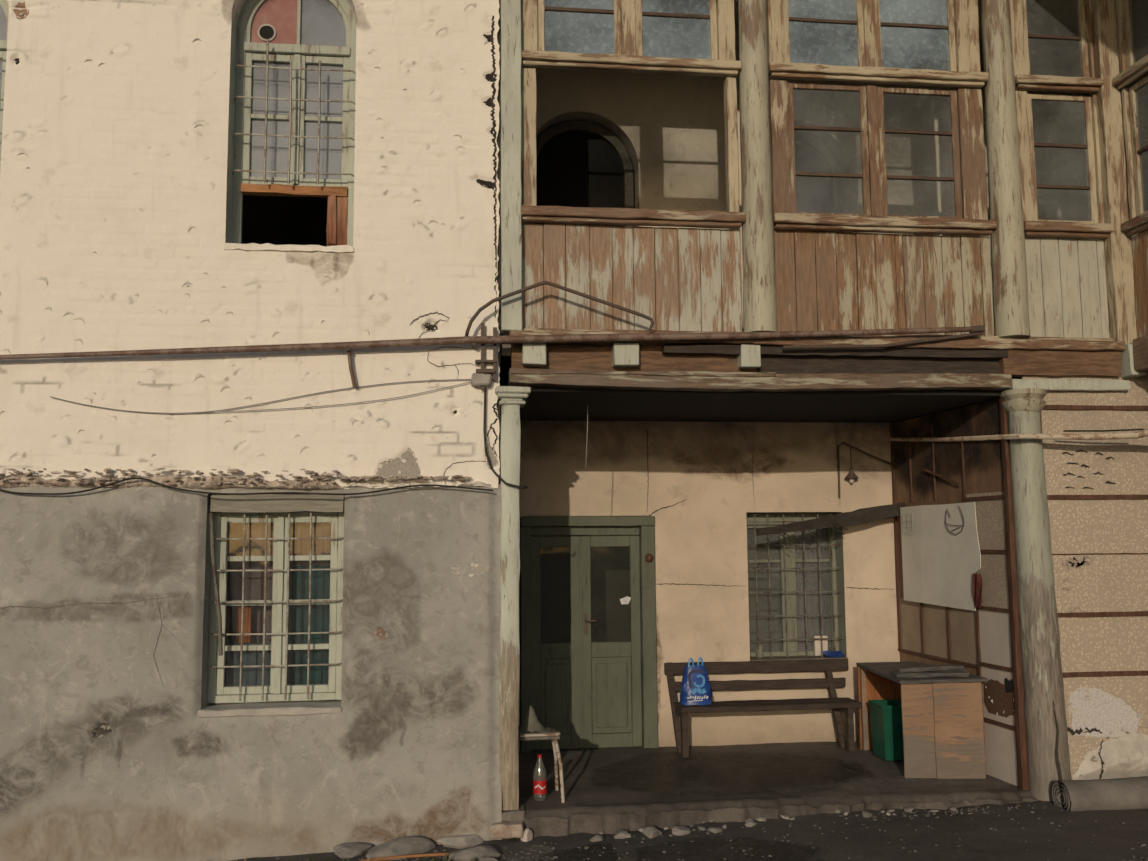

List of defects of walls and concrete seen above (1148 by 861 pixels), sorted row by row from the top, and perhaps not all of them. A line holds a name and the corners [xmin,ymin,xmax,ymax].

peeling [0,448,472,486]
crack [0,594,188,687]
flaking render [1066,687,1148,780]